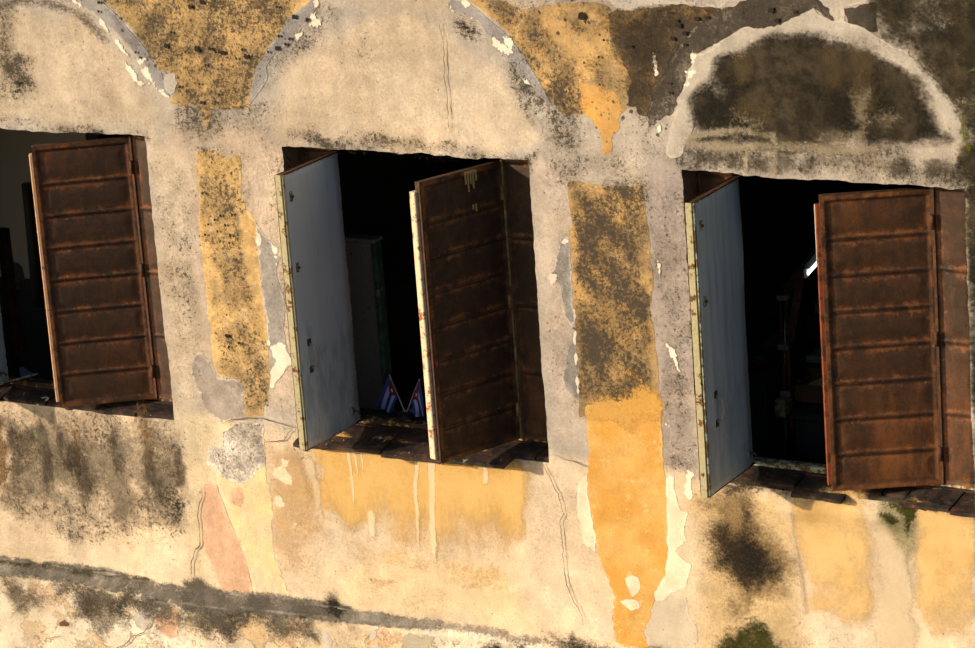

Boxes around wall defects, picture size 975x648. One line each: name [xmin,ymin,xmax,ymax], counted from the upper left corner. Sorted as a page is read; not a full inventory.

peeling [98,0,322,127]
peeling [447,0,721,154]
damp [688,0,975,415]
damp [1,420,190,526]
peeling [191,150,292,597]
damp [273,449,528,558]
crack [542,455,587,620]
peeling [548,181,694,648]
flaking render [134,606,181,639]
damp [0,556,610,648]
flaking render [368,625,445,648]
flaking render [459,630,553,648]